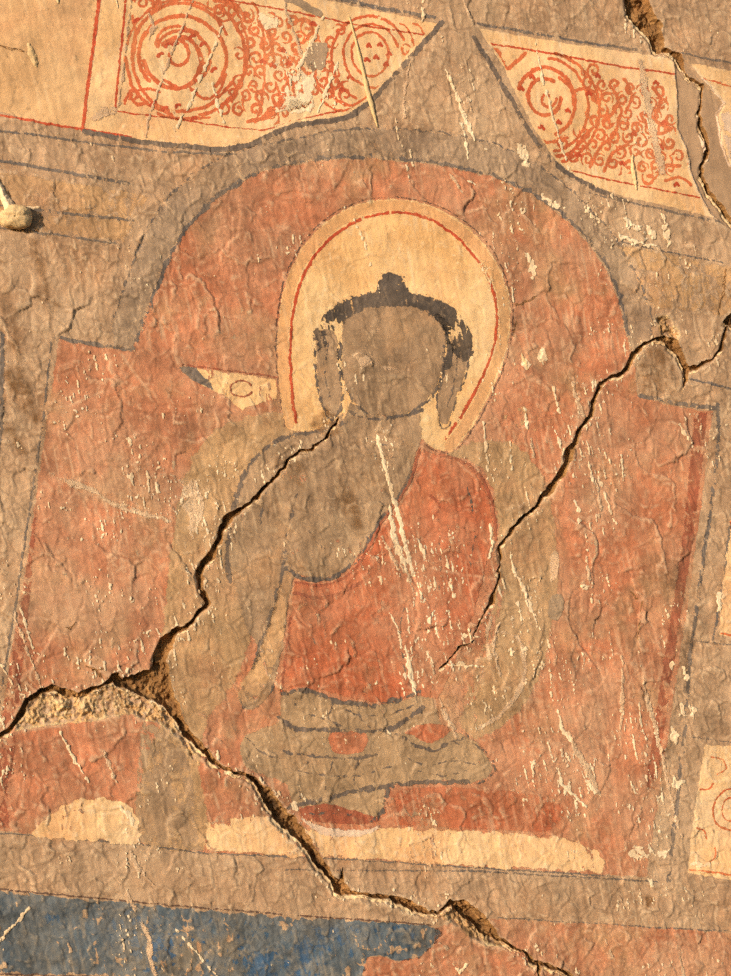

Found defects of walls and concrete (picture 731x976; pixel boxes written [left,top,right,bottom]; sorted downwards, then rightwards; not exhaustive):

peeling [517,143,530,167]
peeling [618,213,672,248]
crack [624,0,731,227]
crack [430,269,731,692]
spalling [15,684,200,766]
crack [0,417,574,976]